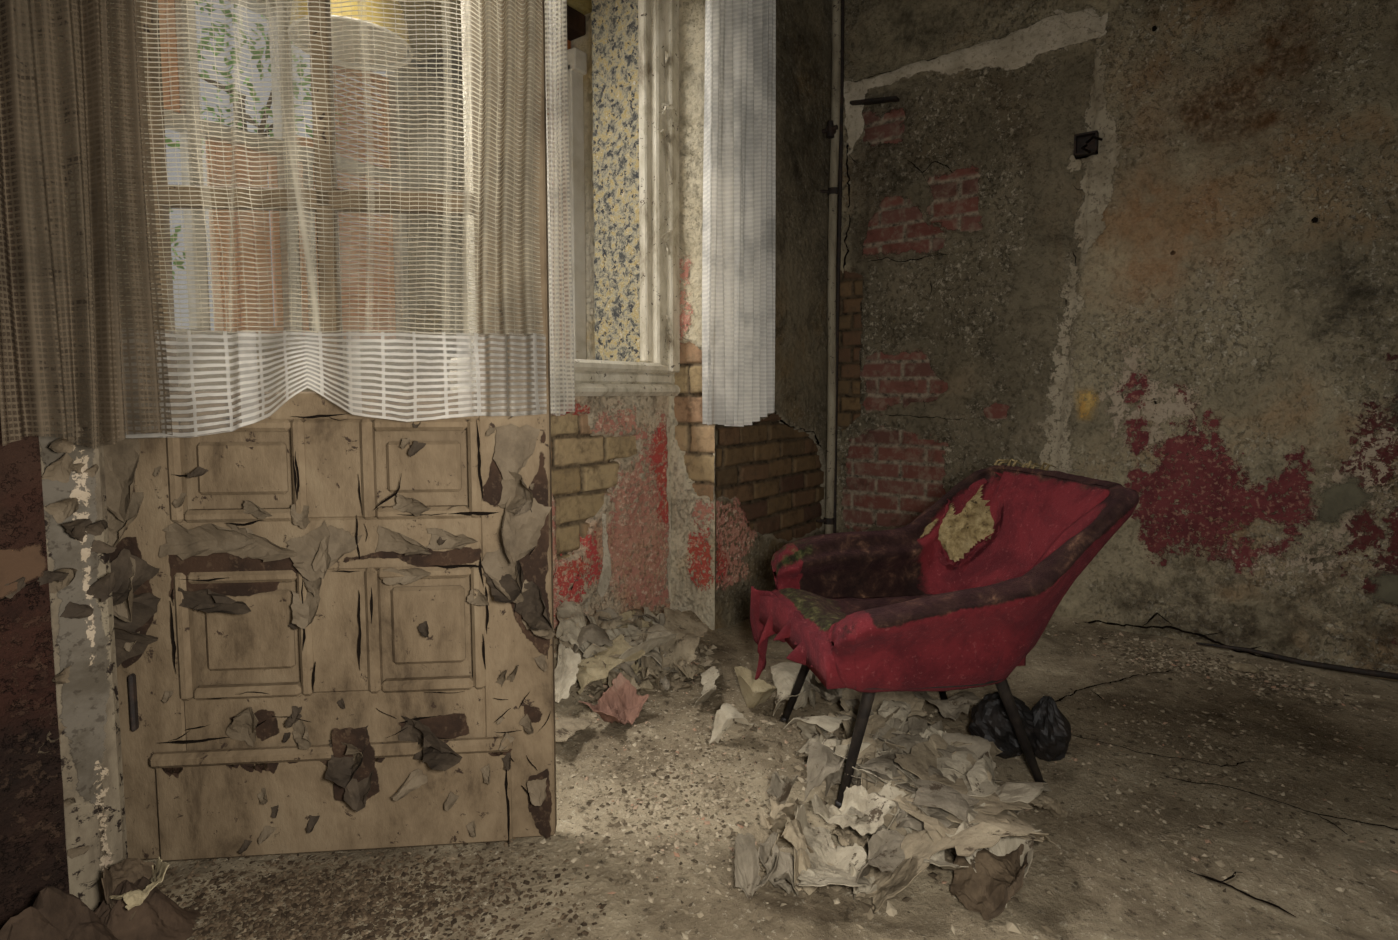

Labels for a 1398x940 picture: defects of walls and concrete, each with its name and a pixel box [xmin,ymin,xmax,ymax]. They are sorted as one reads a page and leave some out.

spalling [844,8,1122,474]
peeling [0,241,824,854]
peeling [1093,316,1398,645]